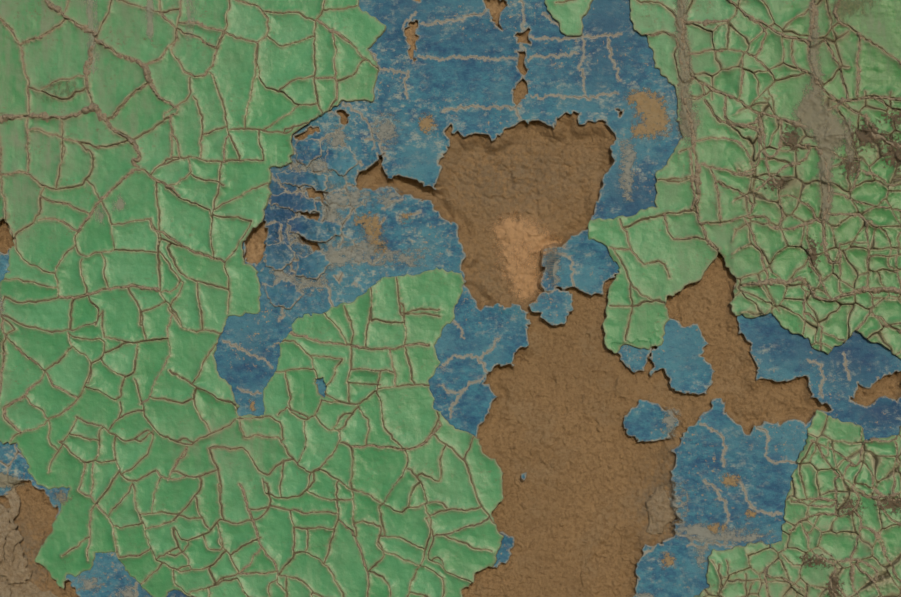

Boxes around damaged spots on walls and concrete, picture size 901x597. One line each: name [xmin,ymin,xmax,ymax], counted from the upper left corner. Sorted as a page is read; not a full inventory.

crack [0,0,493,597]
peeling [0,321,504,597]
peeling [0,0,755,503]
spalling [429,0,901,597]
crack [609,0,901,396]
crack [706,436,901,597]